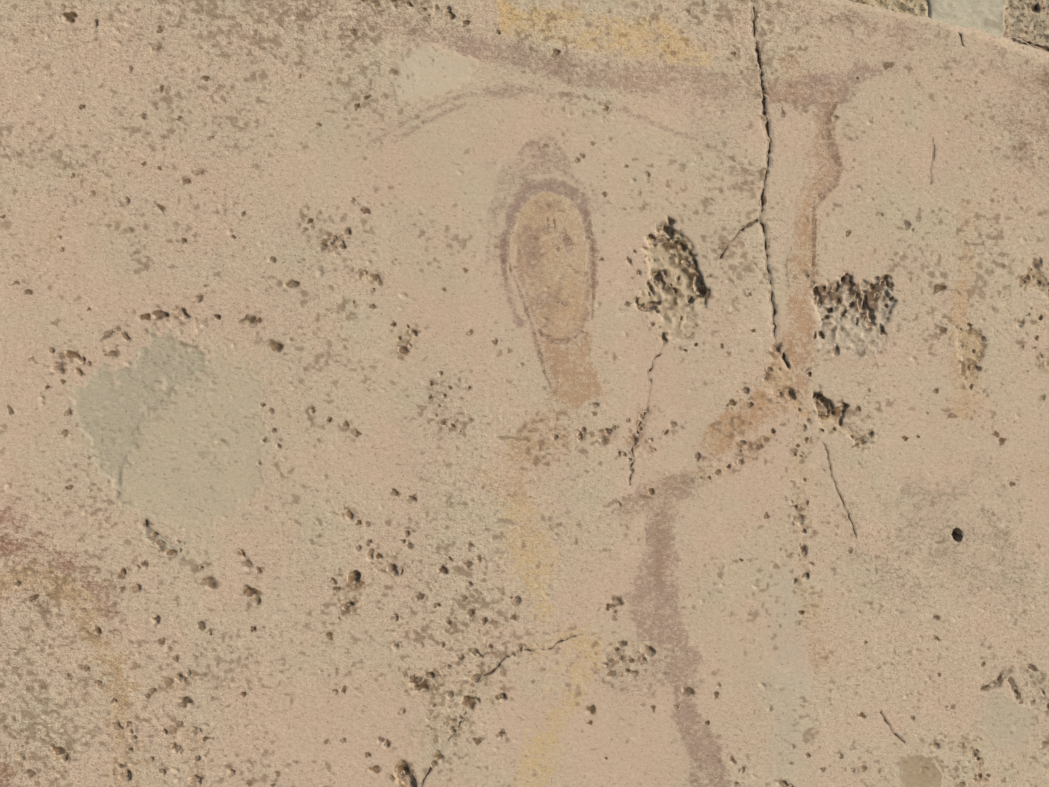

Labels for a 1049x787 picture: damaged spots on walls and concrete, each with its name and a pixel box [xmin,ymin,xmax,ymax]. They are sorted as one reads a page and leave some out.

crack [717,0,790,368]
spalling [624,216,713,352]
spalling [804,271,898,364]